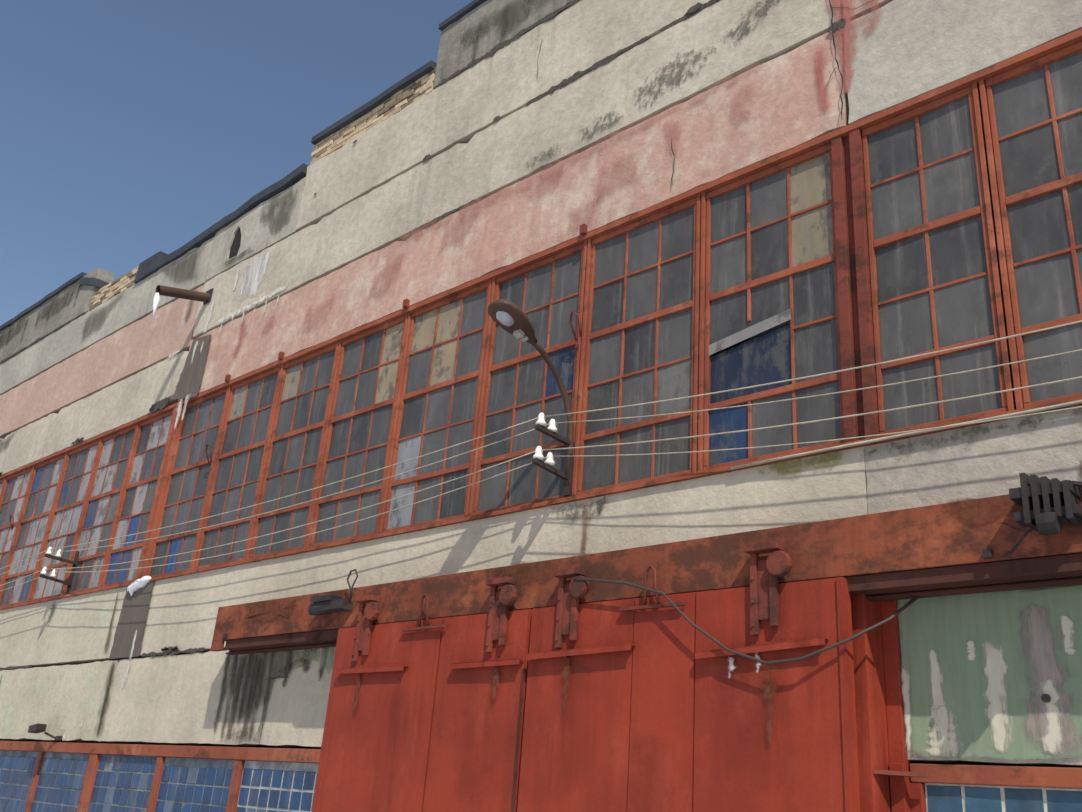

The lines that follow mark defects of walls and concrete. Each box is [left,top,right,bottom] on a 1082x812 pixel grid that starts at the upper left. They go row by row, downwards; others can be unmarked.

crack [826,0,875,119]
corrosion [945,498,1023,525]
corrosion [493,562,556,587]
water stain [214,647,327,744]
peeling [897,585,1082,761]